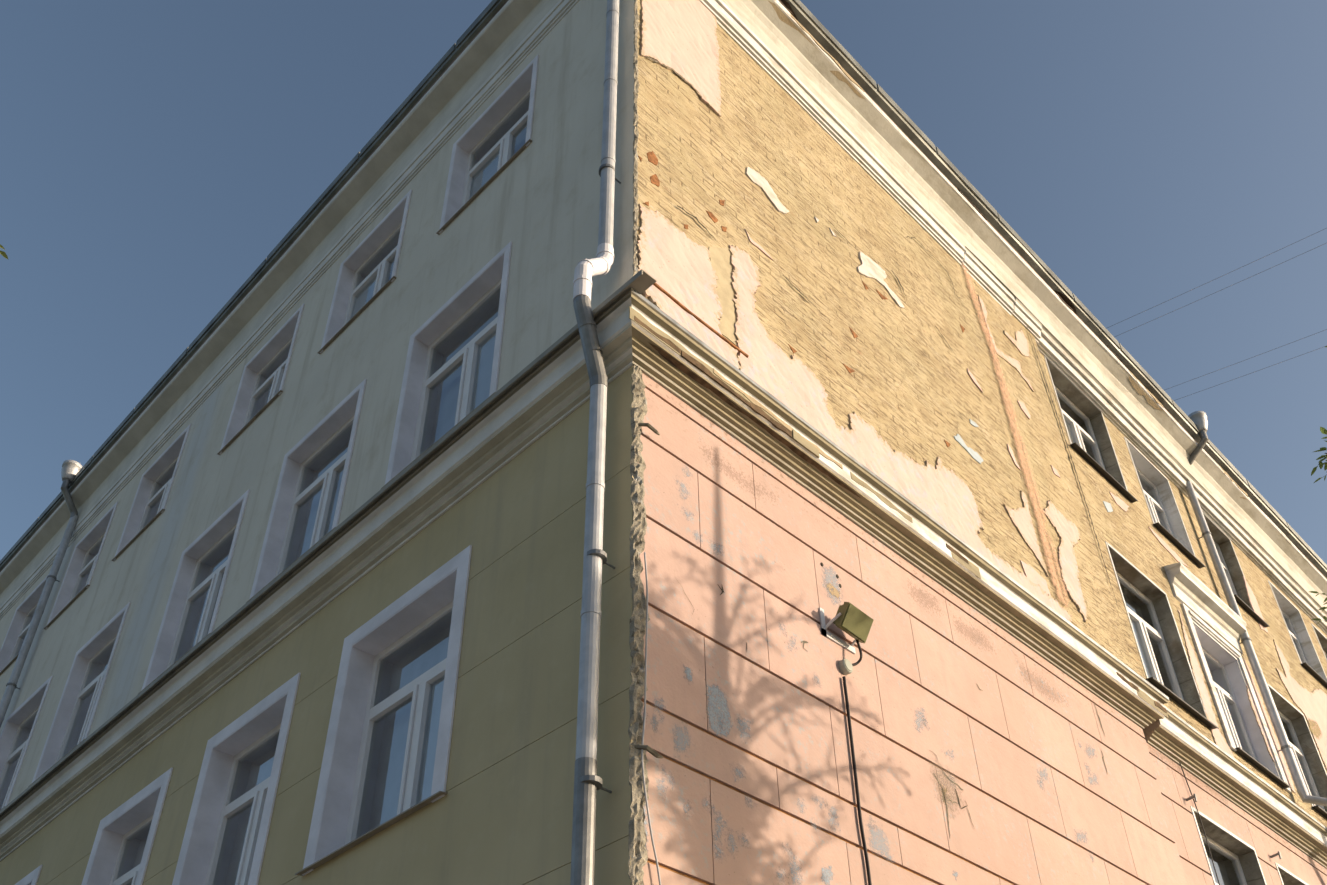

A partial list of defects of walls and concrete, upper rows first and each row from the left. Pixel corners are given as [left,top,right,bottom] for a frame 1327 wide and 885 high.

crack [931,751,975,834]
spalling [628,0,1327,885]